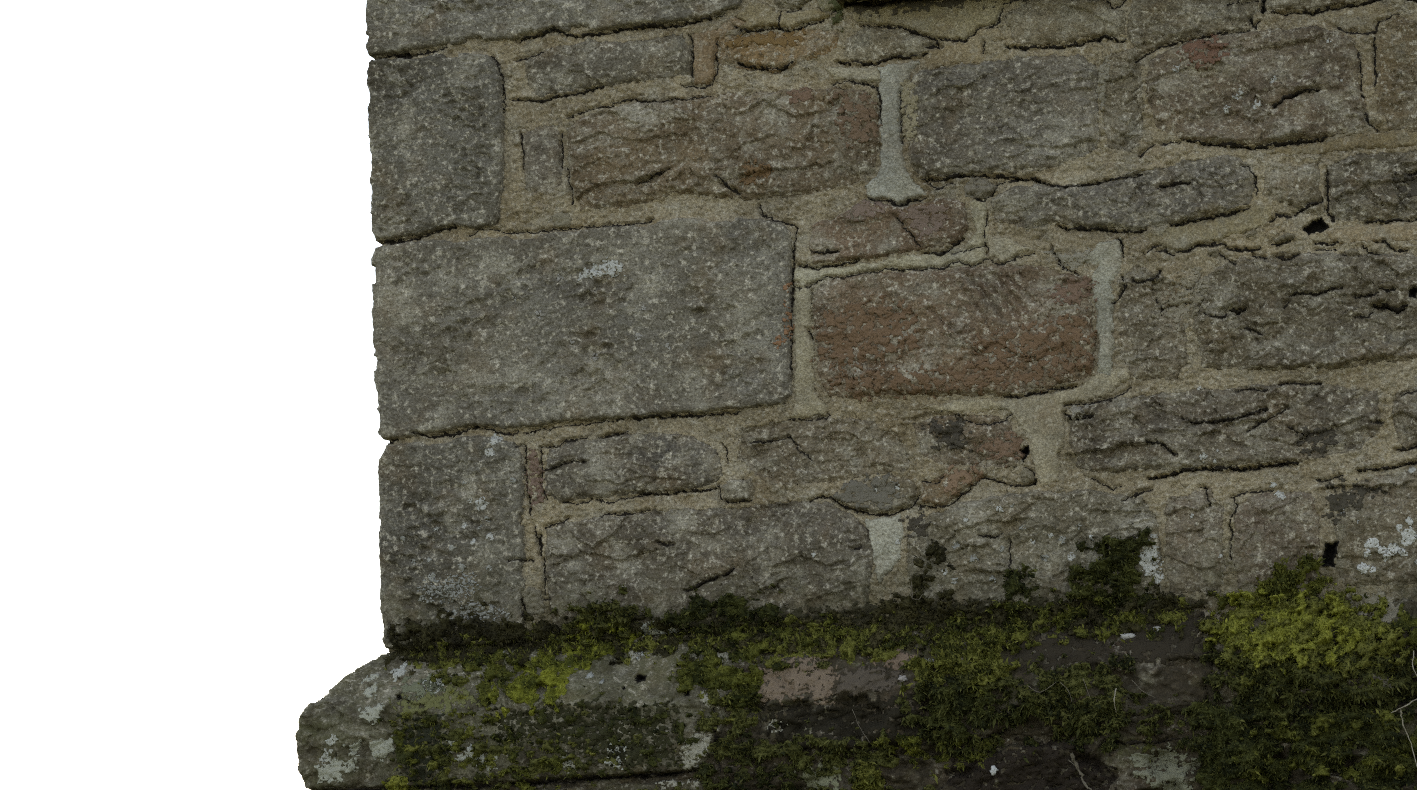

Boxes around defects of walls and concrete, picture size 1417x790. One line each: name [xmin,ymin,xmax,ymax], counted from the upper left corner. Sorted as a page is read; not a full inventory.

damp [743,593,1112,635]
damp [392,710,454,787]
damp [477,695,684,780]
damp [759,690,931,762]
damp [941,735,1117,790]